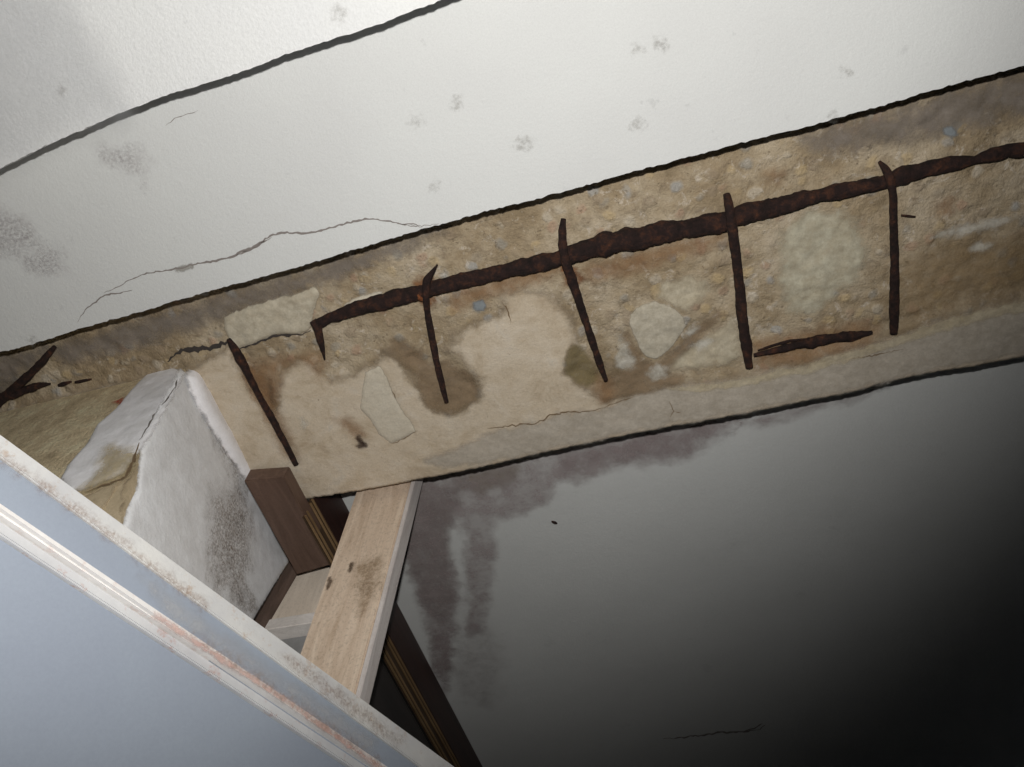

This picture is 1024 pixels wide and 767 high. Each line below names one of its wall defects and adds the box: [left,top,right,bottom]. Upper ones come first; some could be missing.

crack [78,218,433,321]
spalling [0,66,1024,443]
water stain [392,341,478,413]
water stain [566,319,715,401]
rust [757,328,866,359]
spalling [85,454,140,524]
water stain [406,422,725,670]